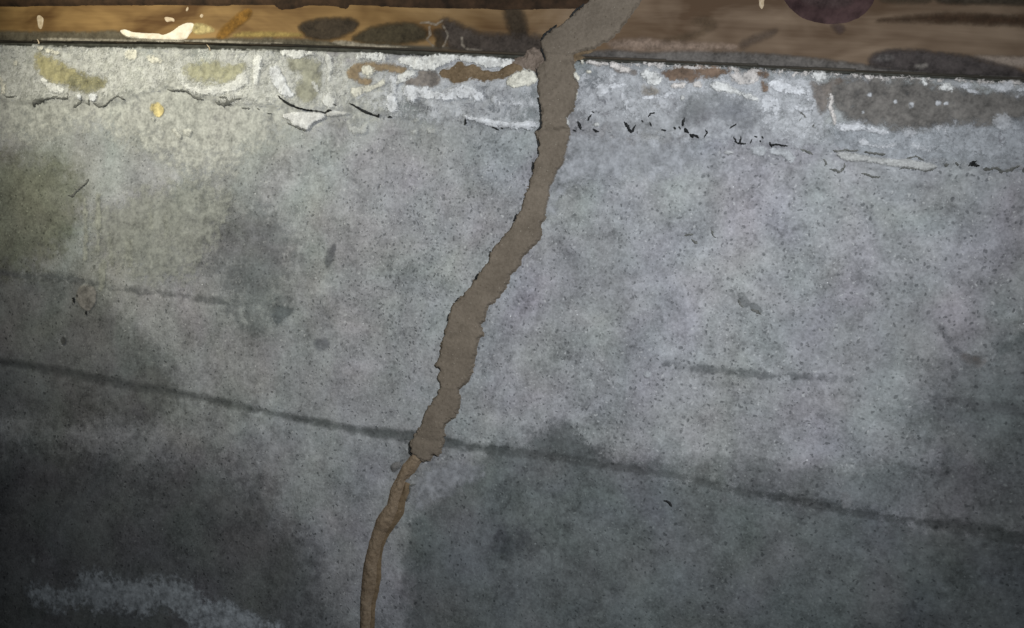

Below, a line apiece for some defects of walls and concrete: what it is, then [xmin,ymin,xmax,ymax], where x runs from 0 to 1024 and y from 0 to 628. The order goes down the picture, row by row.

water stain [35,46,103,101]
water stain [125,50,161,63]
water stain [150,103,164,117]
water stain [177,50,335,108]
water stain [347,52,538,112]
water stain [463,115,539,130]
water stain [573,60,1024,148]
water stain [0,152,179,424]
water stain [0,444,325,628]